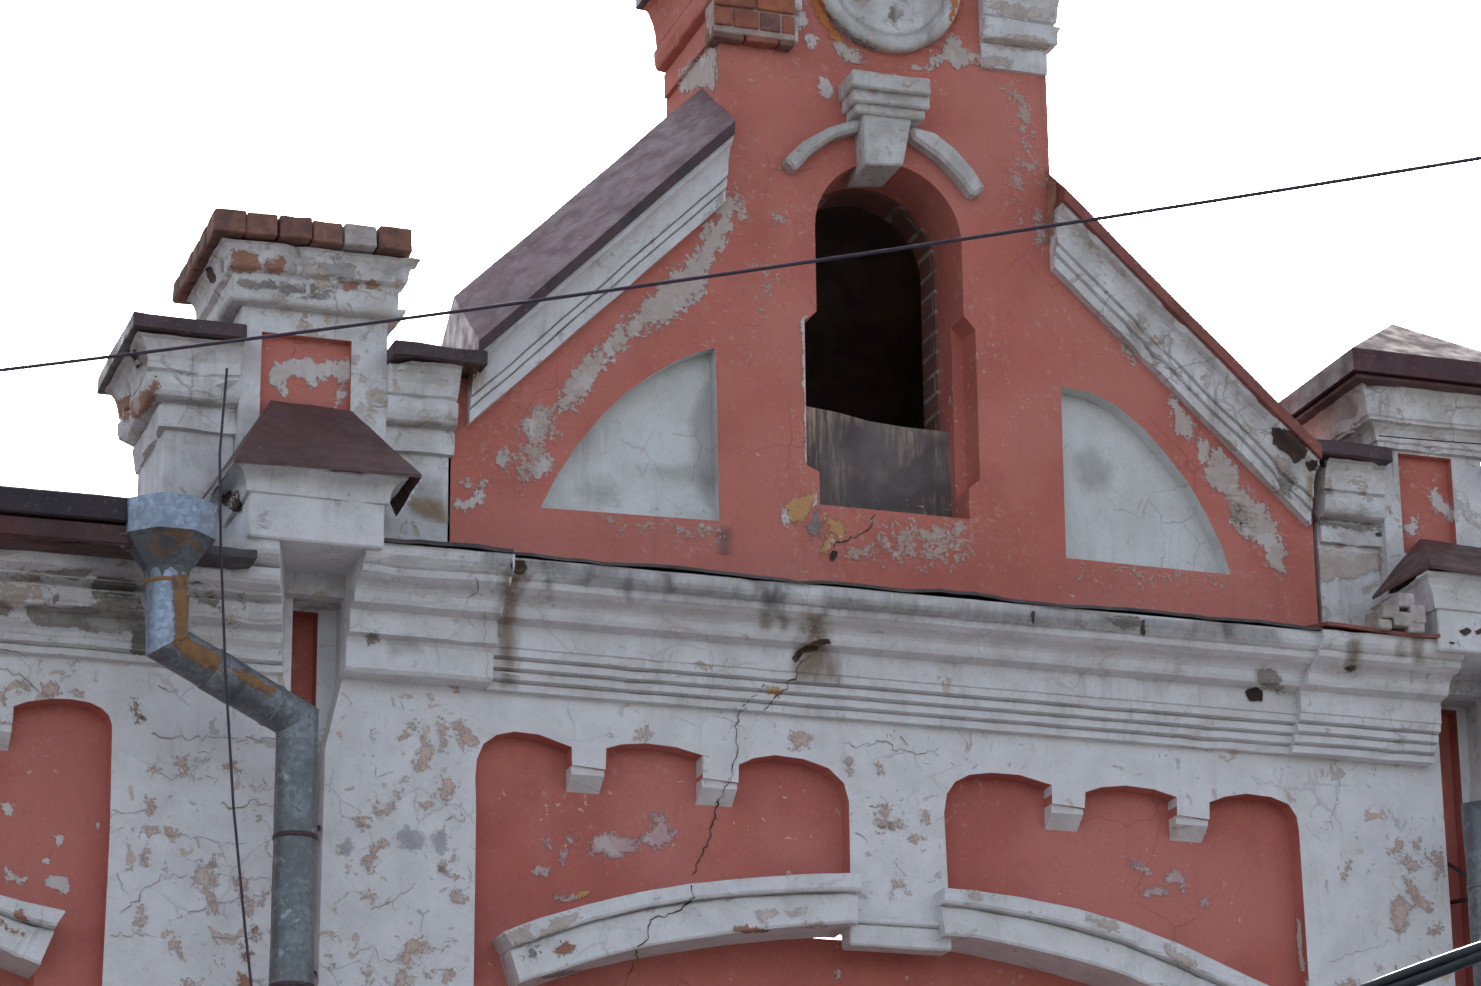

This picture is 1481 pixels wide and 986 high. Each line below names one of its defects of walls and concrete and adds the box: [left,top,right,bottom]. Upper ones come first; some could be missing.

flaking render [677,0,878,95]
peeling [898,0,1058,257]
flaking render [230,248,382,300]
flaking render [116,350,161,425]
peeling [268,357,353,408]
peeling [453,187,752,513]
peeling [781,491,979,573]
peeling [1167,393,1308,576]
peeling [398,716,480,819]
peeling [340,782,469,905]
peeling [531,810,678,877]
crack [625,660,803,986]